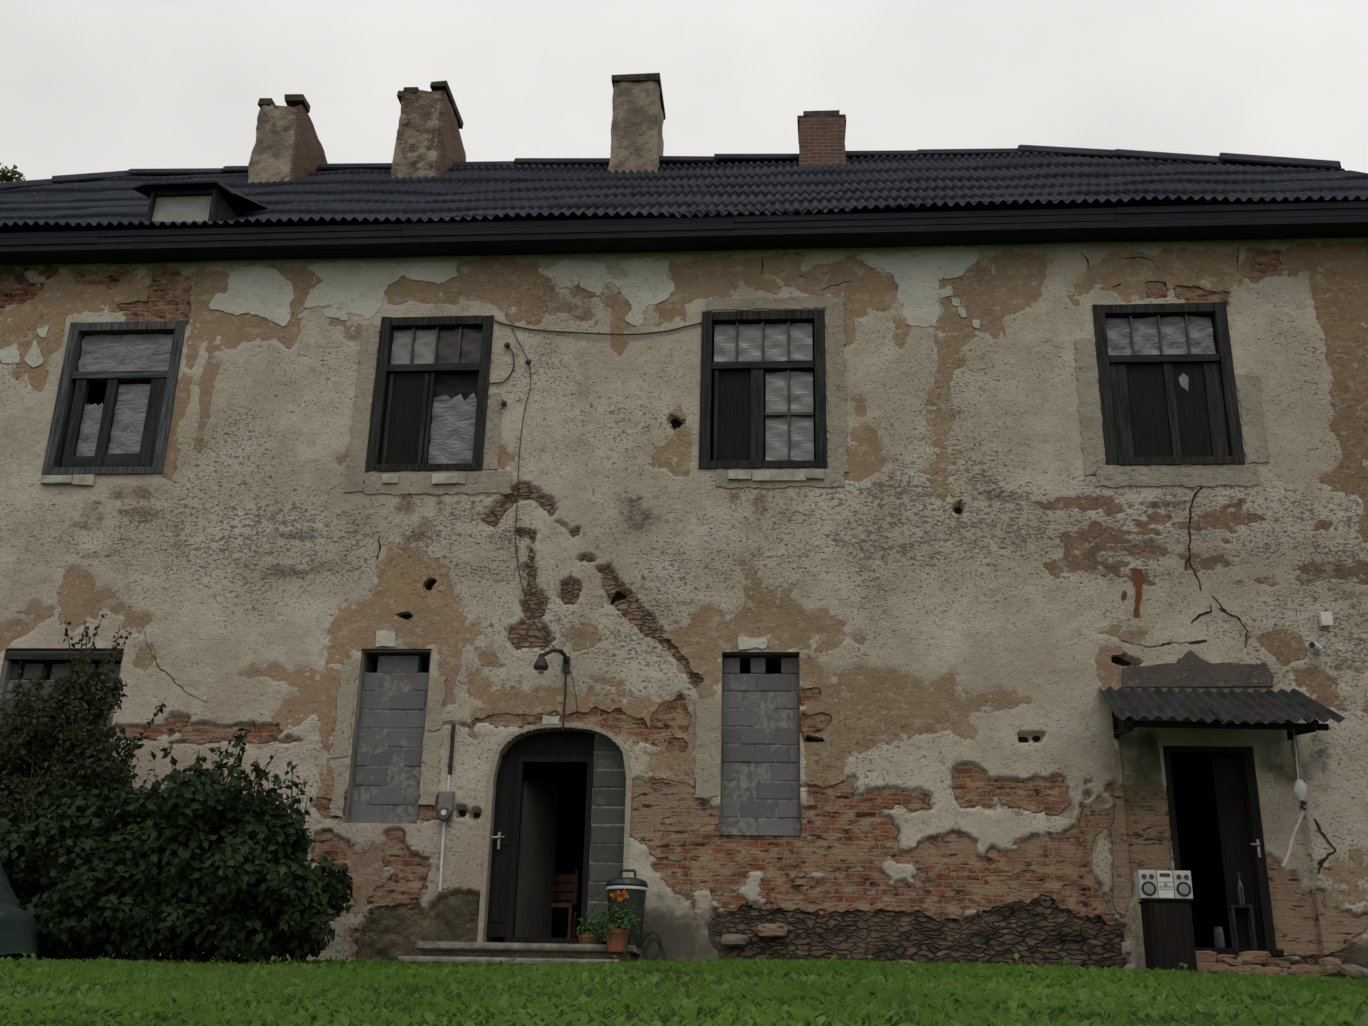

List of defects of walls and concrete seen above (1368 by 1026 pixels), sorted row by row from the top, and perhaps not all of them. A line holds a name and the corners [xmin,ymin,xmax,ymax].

peeling [384,256,633,356]
peeling [653,252,911,349]
peeling [0,264,323,480]
peeling [650,405,692,477]
peeling [922,250,1055,514]
peeling [1067,241,1368,542]
peeling [0,565,157,671]
flaking render [485,484,555,526]
flaking render [1032,495,1267,586]
crack [1121,486,1248,647]
flaking render [1292,560,1368,585]
flaking render [116,531,1171,970]